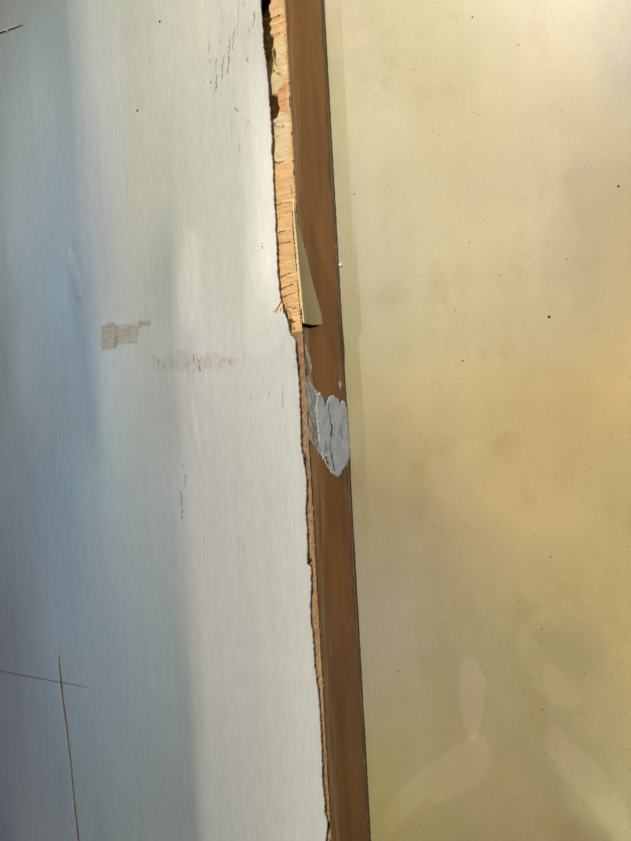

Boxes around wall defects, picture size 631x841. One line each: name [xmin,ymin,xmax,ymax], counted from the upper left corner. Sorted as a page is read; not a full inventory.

spalling [263,0,304,333]